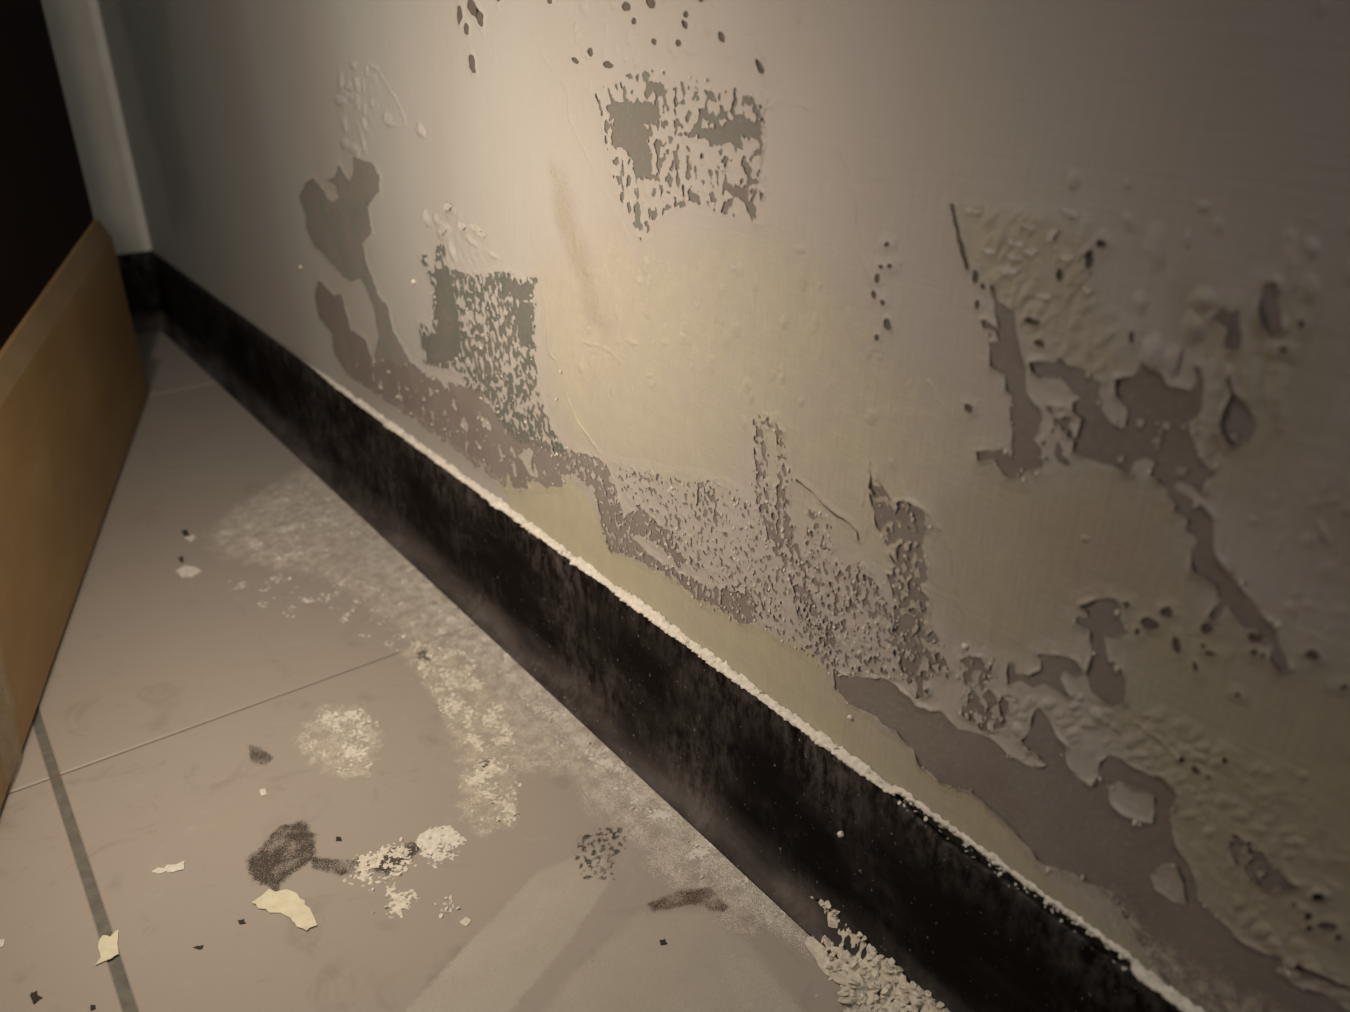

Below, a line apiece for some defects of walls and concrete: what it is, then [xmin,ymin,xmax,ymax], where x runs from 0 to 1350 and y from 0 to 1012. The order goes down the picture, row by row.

spalling [617,0,661,28]
spalling [649,0,708,50]
spalling [715,24,729,48]
peeling [566,42,776,248]
damp [348,157,1297,1012]
peeling [297,153,1350,1012]
damp [1077,565,1350,1011]